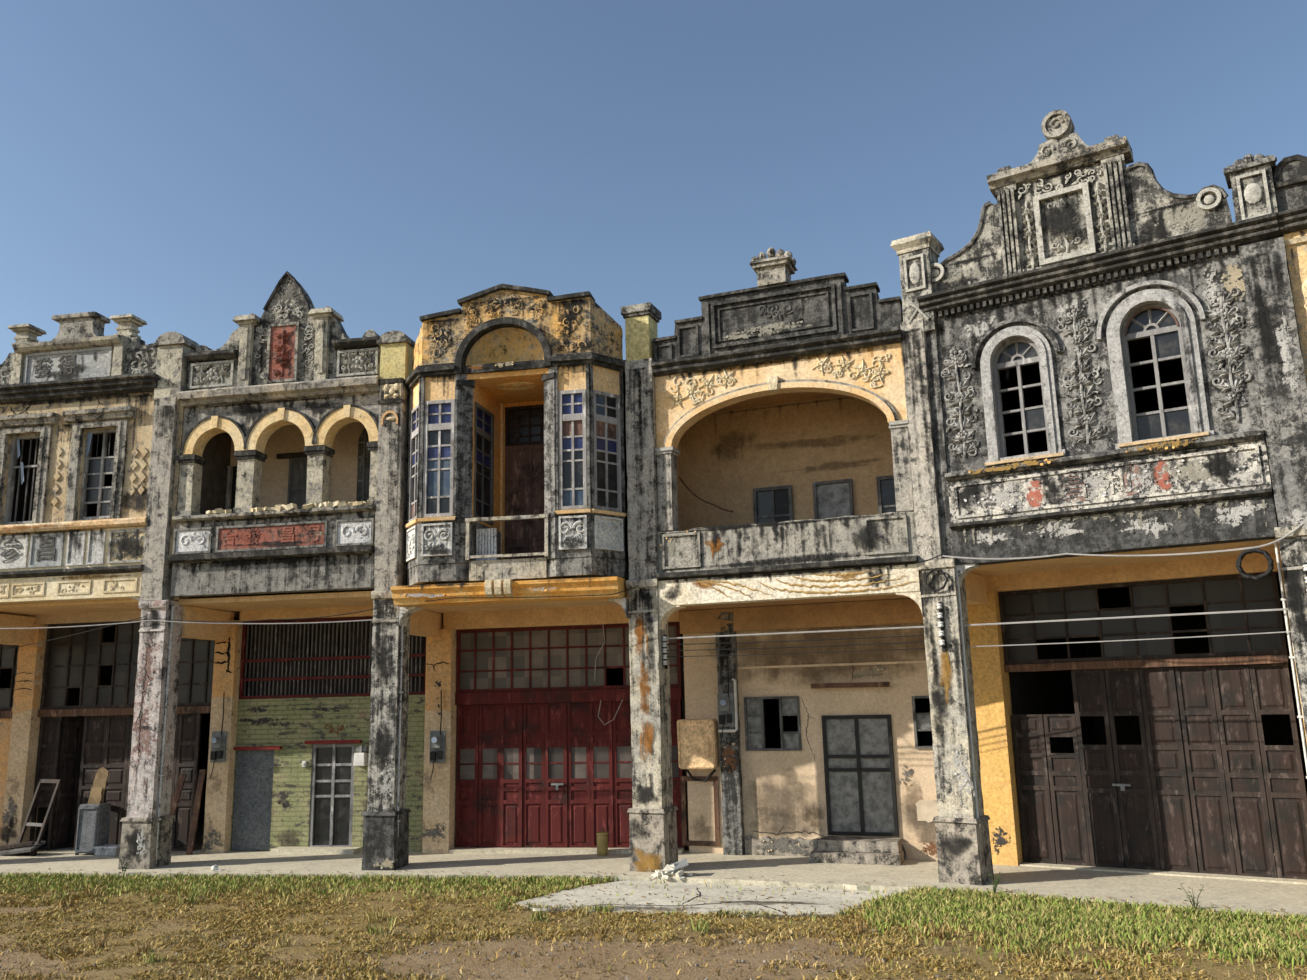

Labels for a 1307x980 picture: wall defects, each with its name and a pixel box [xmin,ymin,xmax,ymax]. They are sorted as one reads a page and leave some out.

leakage [669,346,885,385]
leakage [900,253,1223,486]
peeling [964,458,1058,509]
peeling [1074,437,1216,507]
leakage [950,444,1307,684]
leakage [142,610,158,647]
leakage [370,600,395,684]
leakage [633,513,962,757]
corrosion [634,615,653,757]
leakage [123,830,144,863]
leakage [364,729,392,811]
leakage [758,776,815,835]